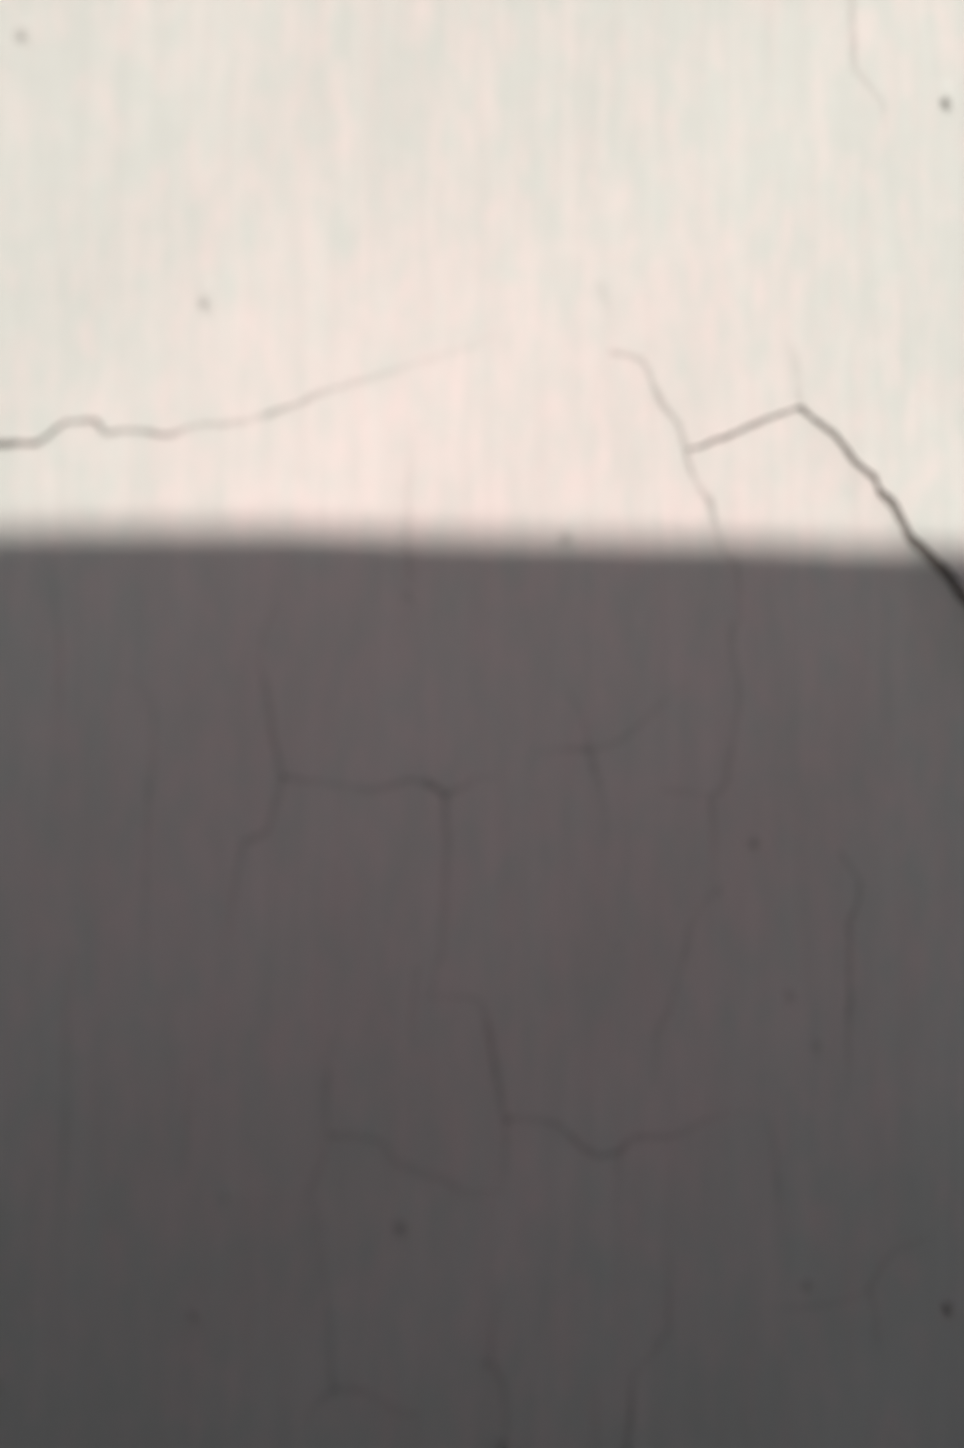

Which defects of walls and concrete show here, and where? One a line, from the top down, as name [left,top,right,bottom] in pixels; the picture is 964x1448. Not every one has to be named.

crack [0,420,99,447]
crack [696,406,964,603]